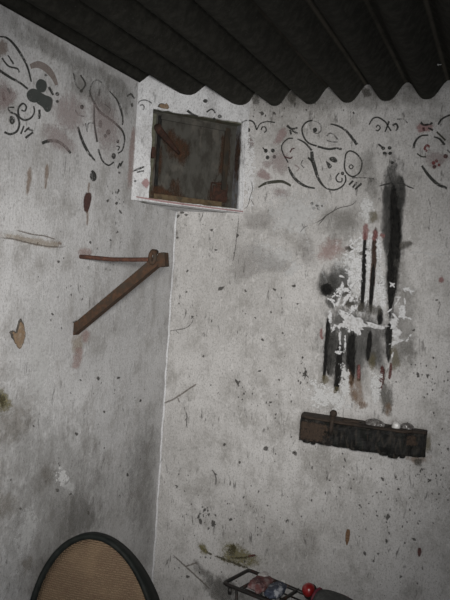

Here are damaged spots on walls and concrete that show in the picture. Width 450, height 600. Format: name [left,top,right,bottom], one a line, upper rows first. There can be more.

rust [154,123,189,173]
rust [219,133,241,180]
rust [151,179,184,197]
peeling [321,197,416,358]
peeling [9,287,54,416]
peeling [298,363,358,412]
peeling [369,368,383,405]
peeling [45,457,74,495]
leakage [199,544,258,569]